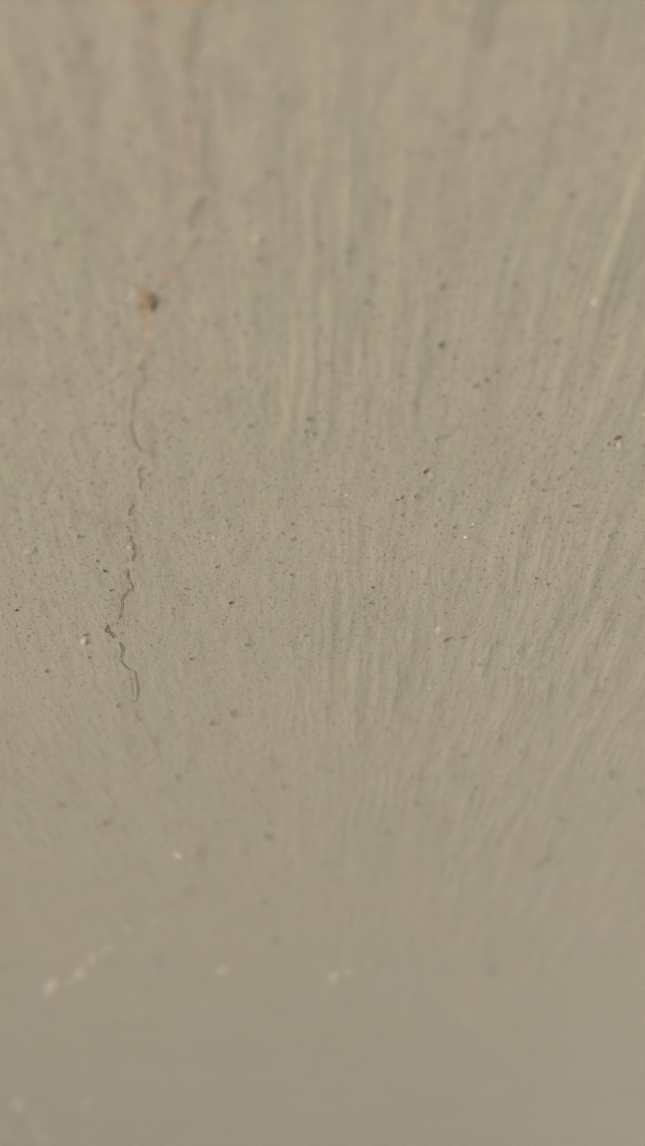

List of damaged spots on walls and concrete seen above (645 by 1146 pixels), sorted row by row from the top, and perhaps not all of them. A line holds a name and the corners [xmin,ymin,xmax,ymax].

crack [158,4,217,289]
crack [103,335,160,763]